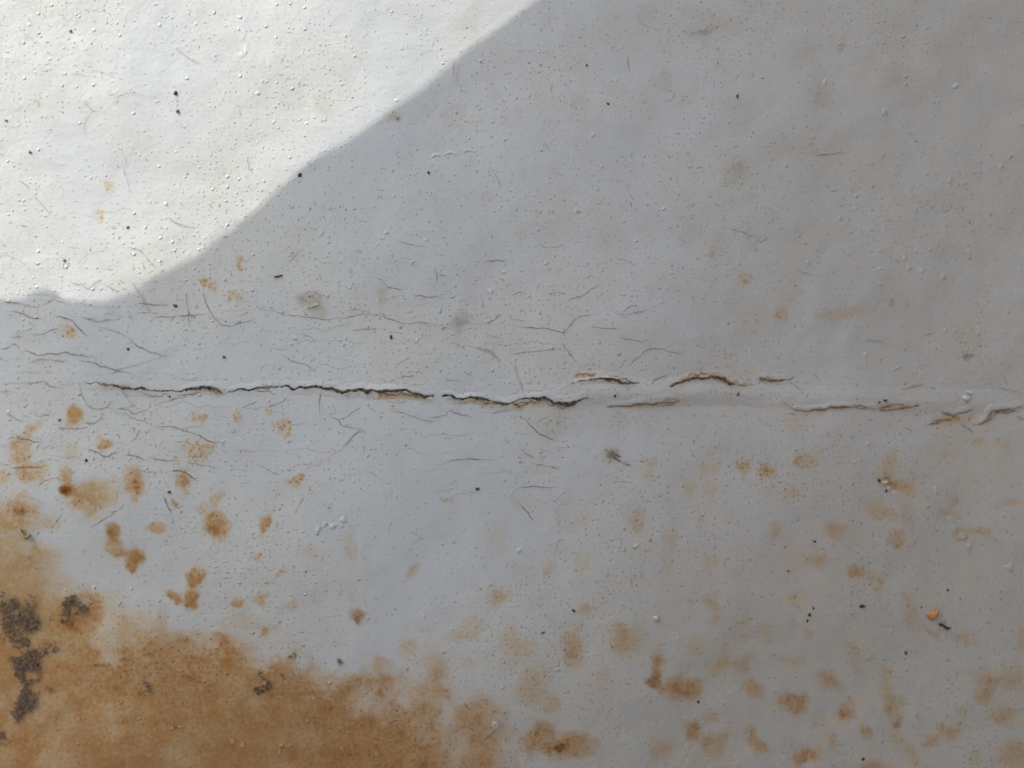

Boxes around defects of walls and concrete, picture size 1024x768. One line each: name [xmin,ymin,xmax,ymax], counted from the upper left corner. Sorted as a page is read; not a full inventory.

crack [83,367,785,415]
crack [794,401,910,412]
crack [929,400,1024,431]
water stain [0,591,62,739]